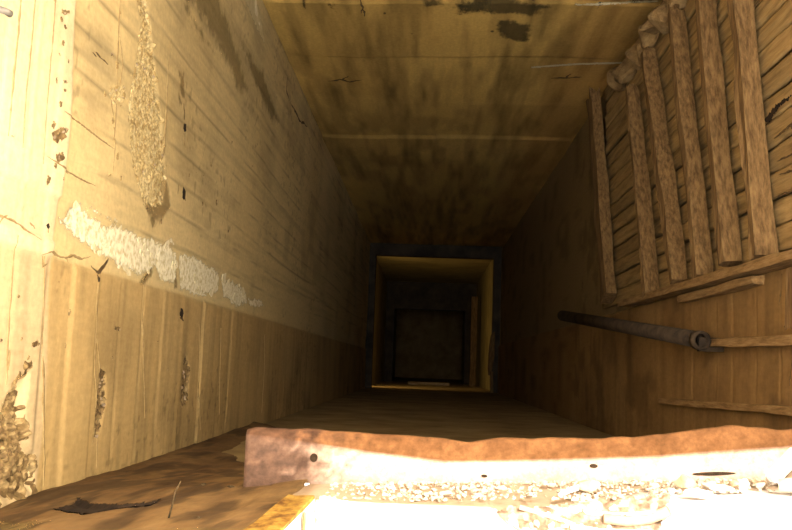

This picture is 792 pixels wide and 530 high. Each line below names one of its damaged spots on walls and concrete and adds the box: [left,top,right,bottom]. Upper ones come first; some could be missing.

water stain [457,0,548,42]
water stain [148,166,170,226]
crack [0,214,109,487]
spalling [94,368,106,438]